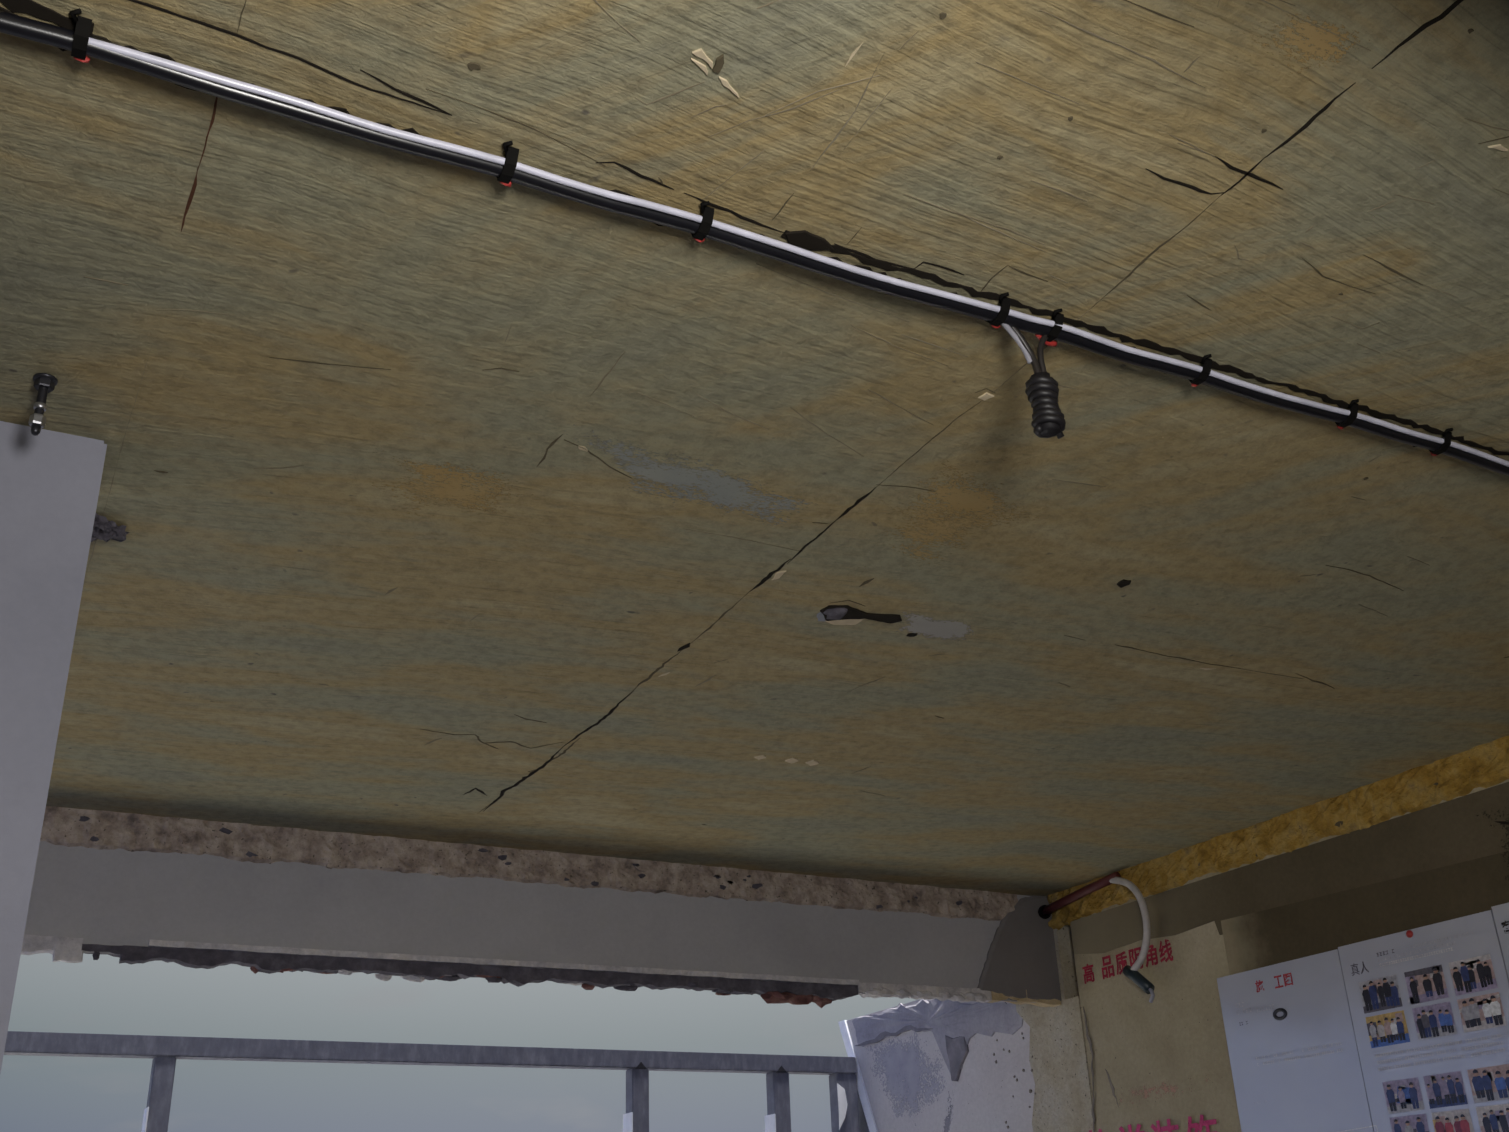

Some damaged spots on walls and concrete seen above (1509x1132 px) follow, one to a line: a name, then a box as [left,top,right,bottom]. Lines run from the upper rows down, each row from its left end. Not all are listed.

crack [422,0,1464,812]
spalling [91,513,129,542]
spalling [40,806,1018,921]